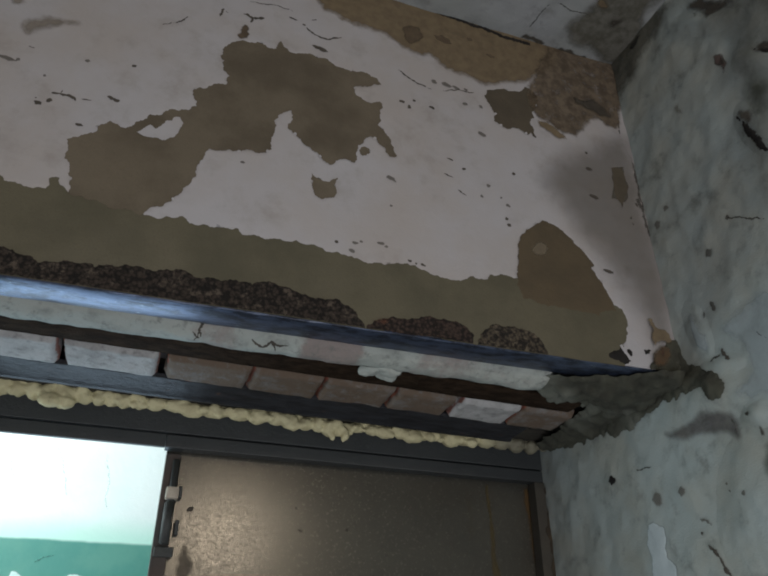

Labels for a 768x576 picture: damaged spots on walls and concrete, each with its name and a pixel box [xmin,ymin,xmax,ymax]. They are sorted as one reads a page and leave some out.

crack [736,116,768,151]
peeling [0,25,632,366]
peeling [612,167,638,207]
crack [193,323,204,340]
crack [252,339,287,351]